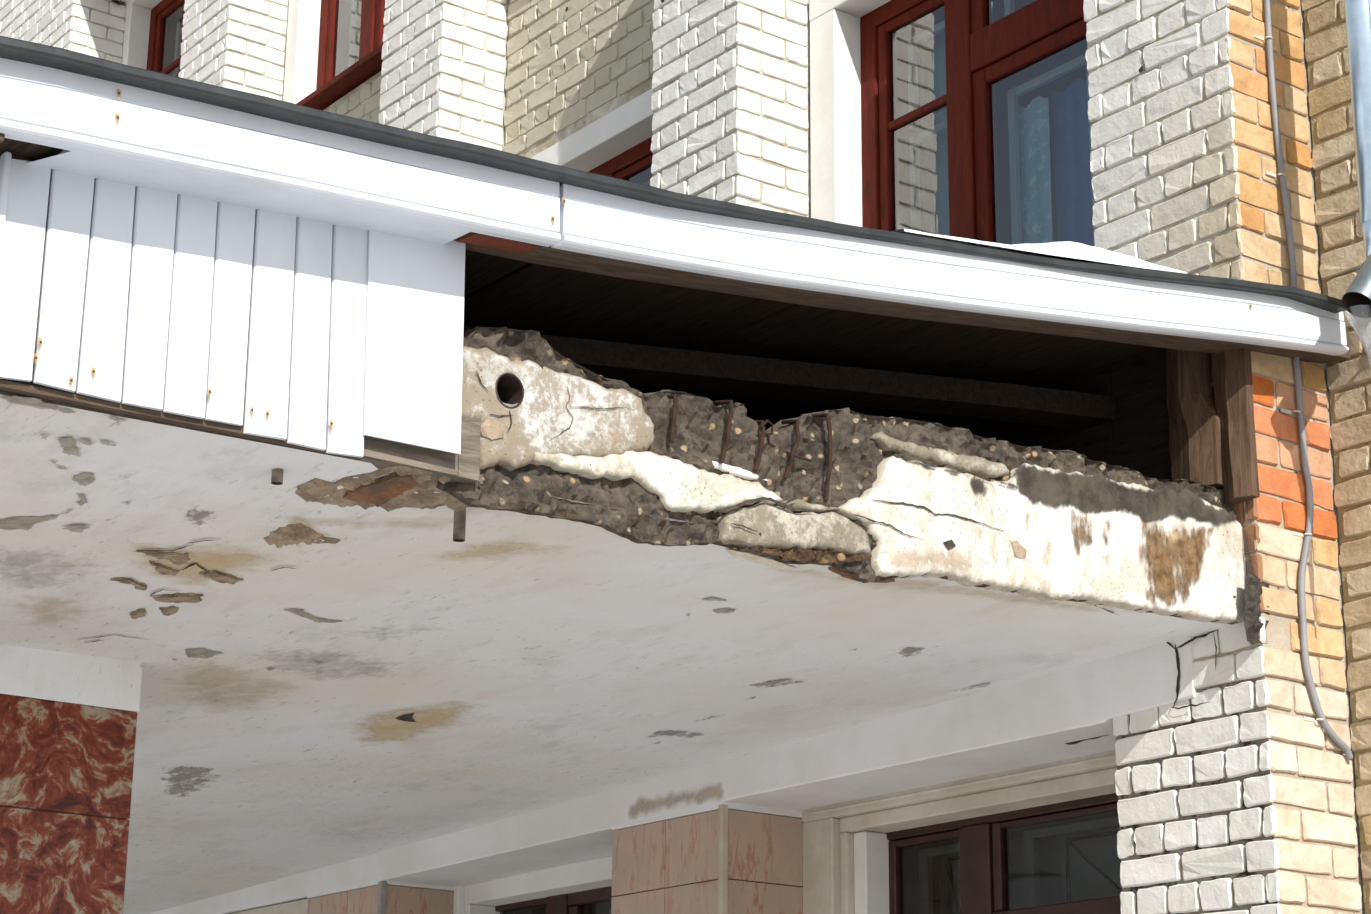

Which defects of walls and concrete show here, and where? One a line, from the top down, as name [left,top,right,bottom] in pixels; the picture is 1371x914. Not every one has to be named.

crack [552,386,636,439]
peeling [0,435,116,533]
spalling [295,326,1270,644]
peeling [186,510,215,525]
spalling [264,523,341,548]
peeling [111,550,244,619]
rust [1140,521,1213,606]
peeling [750,679,802,699]
peeling [899,647,923,657]
crack [1166,630,1217,709]
damp [367,708,457,741]
damp [631,788,720,815]